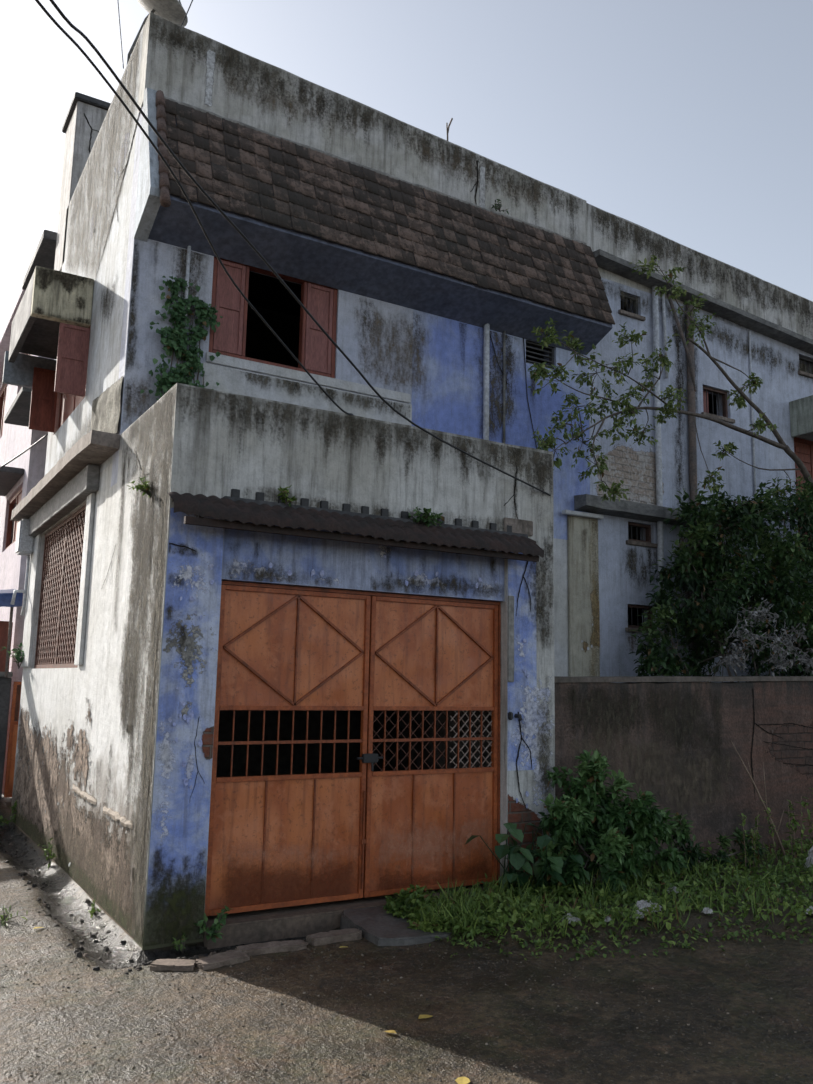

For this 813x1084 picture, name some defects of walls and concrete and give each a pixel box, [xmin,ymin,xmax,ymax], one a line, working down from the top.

crack [84,113,99,153]
damp [187,331,552,490]
damp [363,303,424,385]
flaking render [595,444,666,505]
damp [593,208,810,323]
damp [601,280,813,487]
damp [11,384,206,945]
peeling [153,564,217,838]
peeling [14,699,135,931]